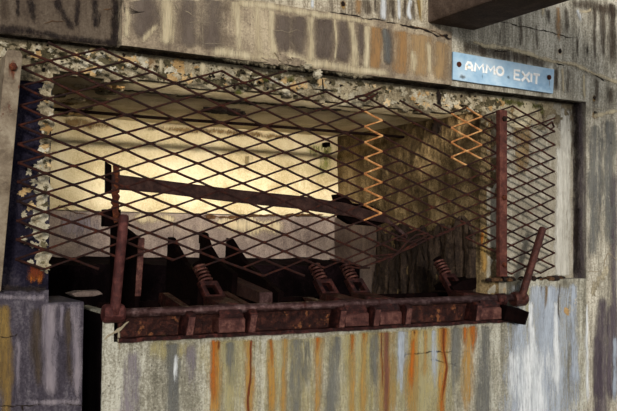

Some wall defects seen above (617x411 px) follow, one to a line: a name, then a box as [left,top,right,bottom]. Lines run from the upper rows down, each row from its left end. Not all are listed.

crack [331,12,451,40]
crack [504,22,580,38]
spalling [0,41,506,116]
spalling [17,83,125,274]
leakage [587,121,617,411]
leakage [0,285,81,405]
corrosion [210,340,255,411]
corrosion [267,338,322,411]
corrosion [343,333,373,411]
corrosion [380,328,449,411]
corrosion [463,326,477,407]